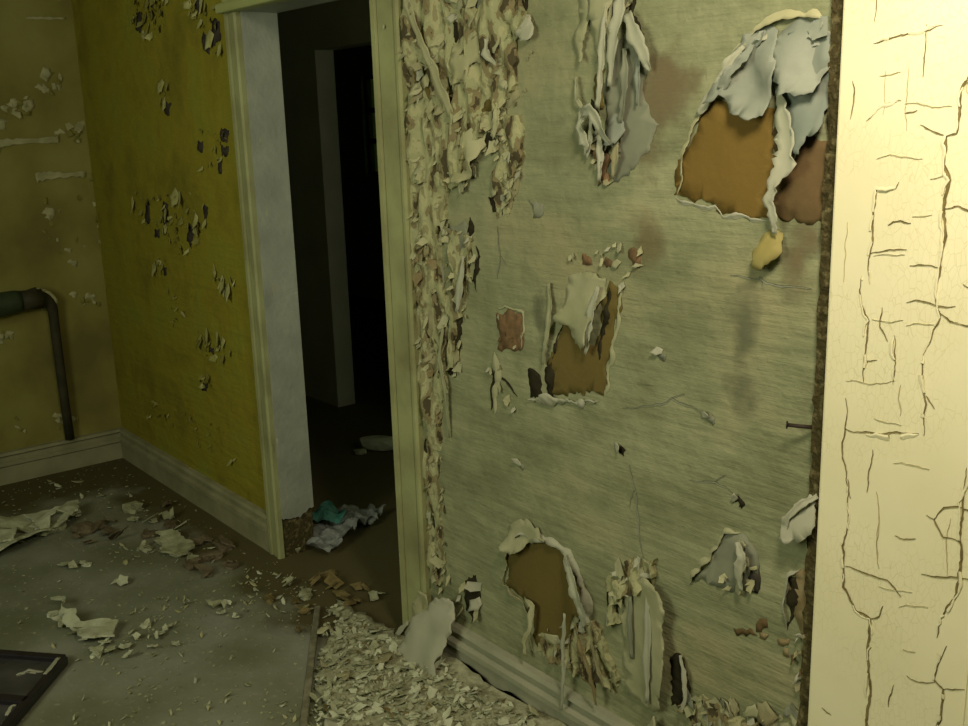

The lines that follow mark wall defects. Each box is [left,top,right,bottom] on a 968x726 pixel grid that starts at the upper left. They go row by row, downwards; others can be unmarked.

peeling [182,0,222,57]
peeling [130,187,208,255]
peeling [674,99,827,225]
peeling [394,0,534,594]
peeling [547,242,643,396]
crack [840,0,968,726]
peeling [455,575,482,622]
peeling [505,542,581,670]
flaking render [689,528,761,597]
flaking render [781,569,806,692]
peeling [778,494,819,549]
peeling [677,689,799,726]